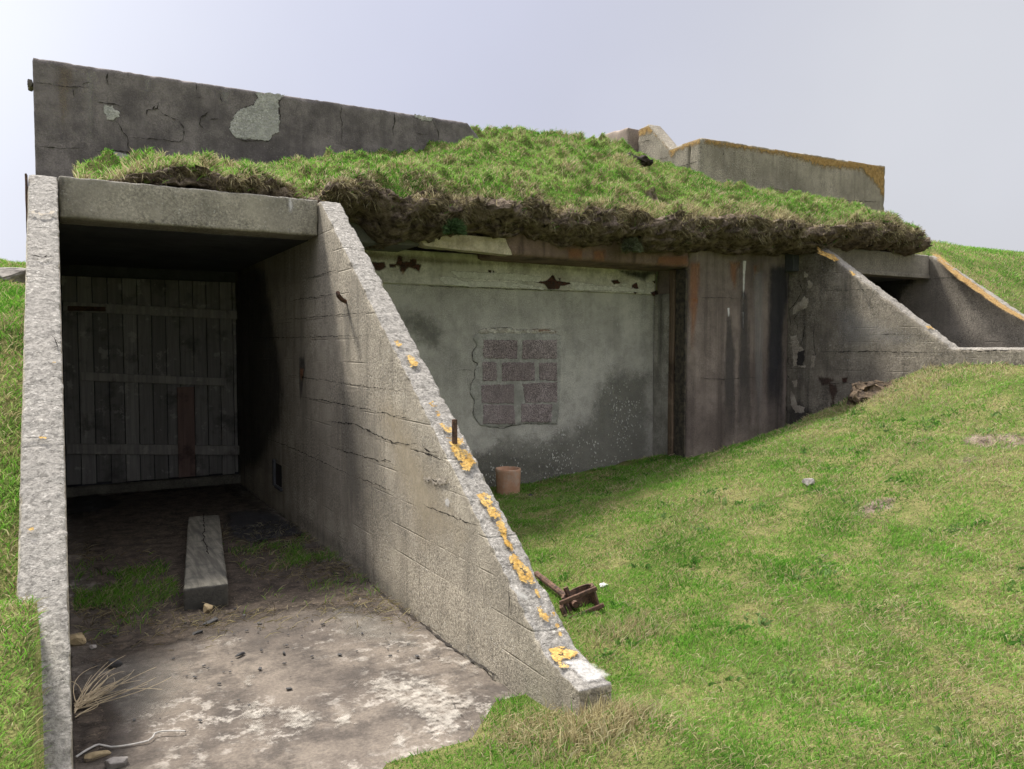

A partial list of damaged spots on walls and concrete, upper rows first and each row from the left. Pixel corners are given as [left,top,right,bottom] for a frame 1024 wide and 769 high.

spalling [104,105,120,120]
crack [36,74,283,153]
spalling [230,92,285,141]
rust [372,256,421,272]
rust [477,233,698,315]
spalling [793,272,813,315]
leakage [725,261,749,405]
leakage [768,267,788,398]
spalling [790,335,816,368]
spalling [790,380,805,413]
crack [278,375,483,526]